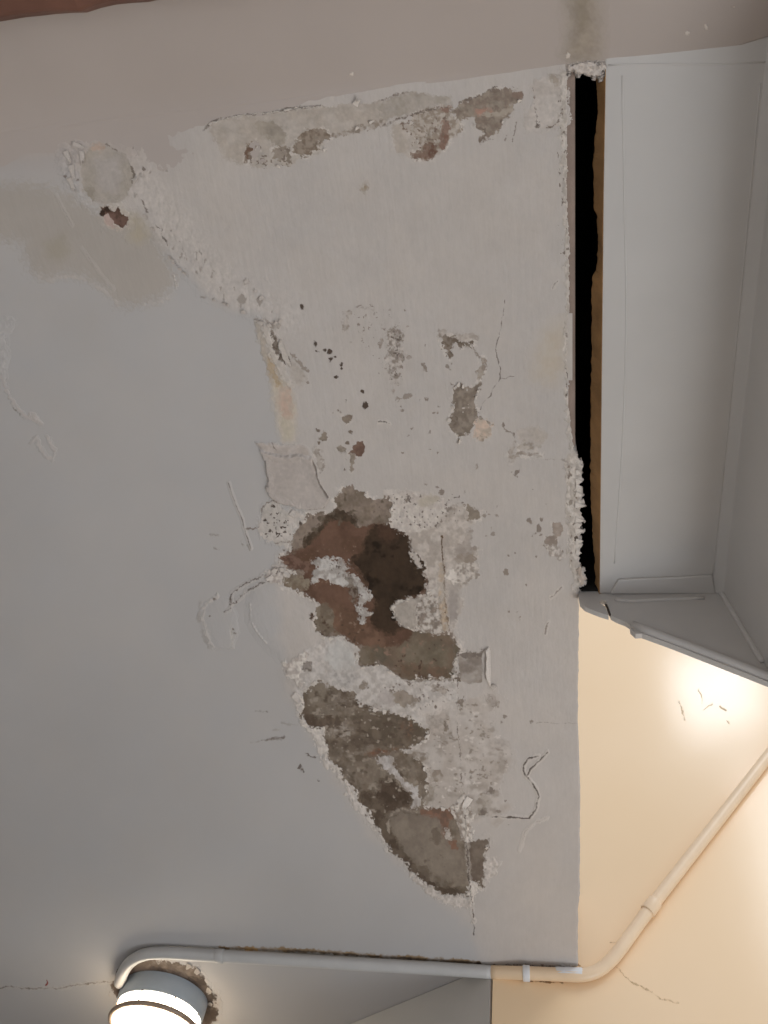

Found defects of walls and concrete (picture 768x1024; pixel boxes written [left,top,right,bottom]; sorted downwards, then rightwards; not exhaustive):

spalling [91,196,138,239]
peeling [202,67,587,596]
crack [480,300,515,410]
spalling [247,390,520,912]
crack [436,535,550,935]